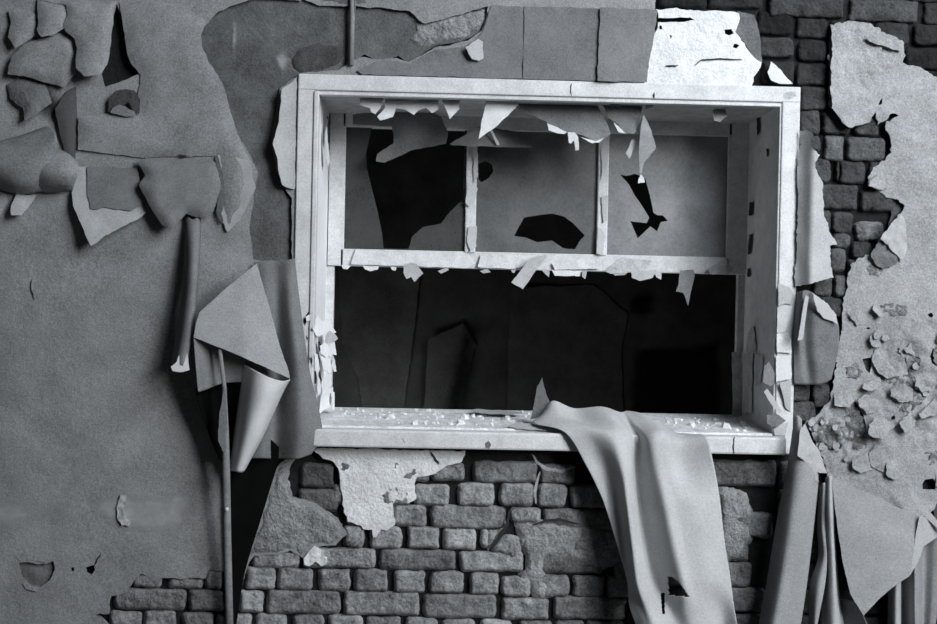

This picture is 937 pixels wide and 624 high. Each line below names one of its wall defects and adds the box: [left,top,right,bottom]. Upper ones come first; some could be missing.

peeling [466,101,656,207]
peeling [341,195,662,289]
flaking render [644,0,937,516]
peeling [303,312,338,413]
flaking render [116,495,131,526]
flaking render [98,569,225,624]
flaking render [237,460,628,624]
flaking render [713,459,788,624]
flaking render [801,513,822,624]
flaking render [864,592,888,624]